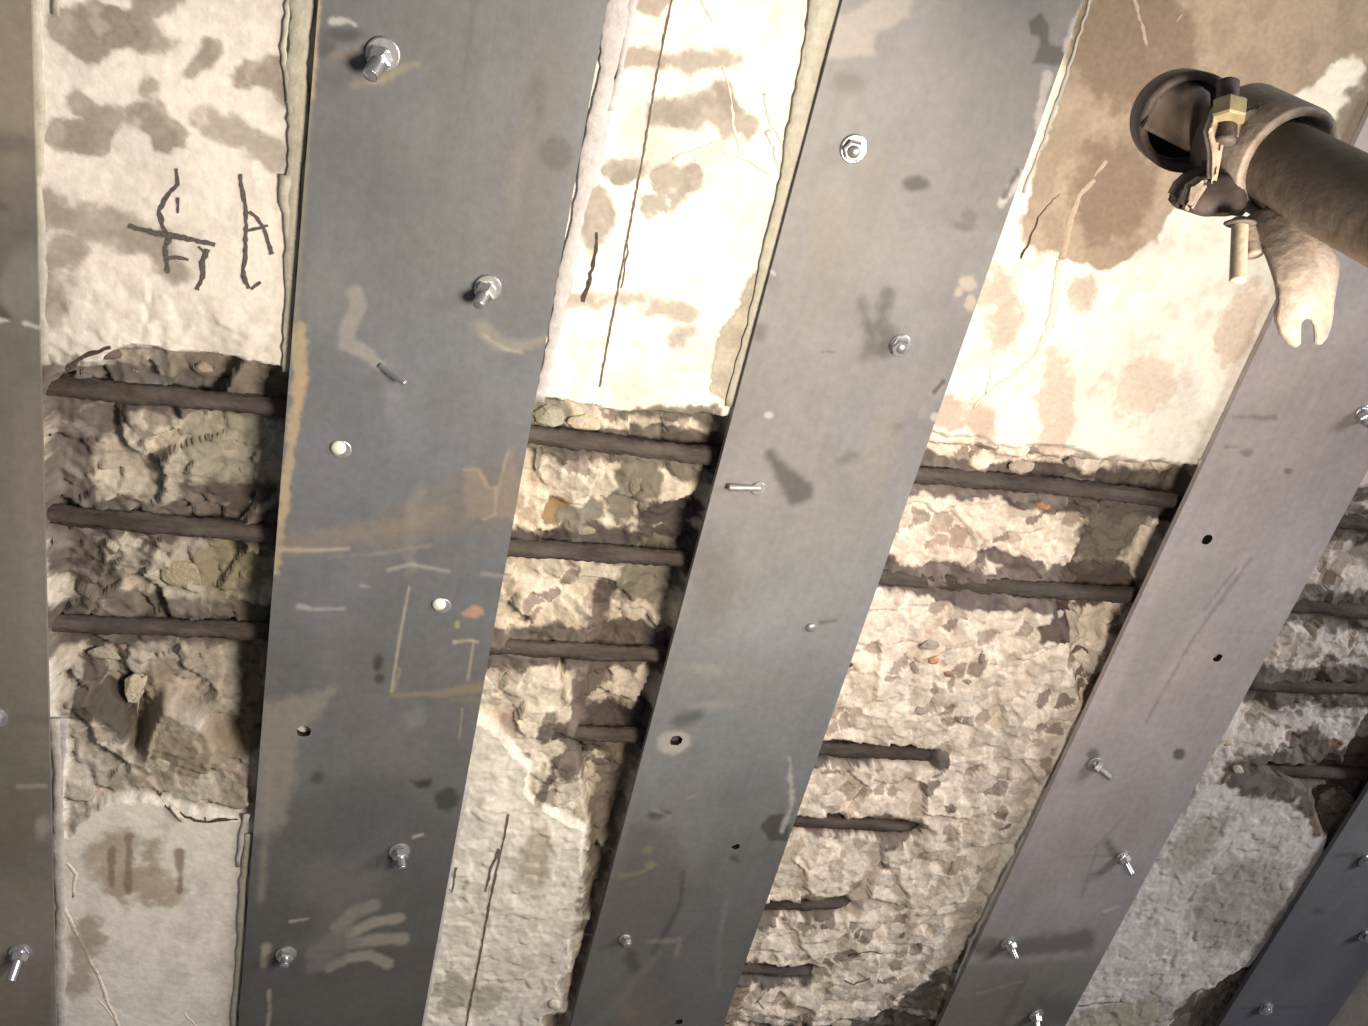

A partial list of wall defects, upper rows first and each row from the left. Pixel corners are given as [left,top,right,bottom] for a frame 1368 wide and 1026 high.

water stain [48,0,184,63]
water stain [44,80,288,172]
crack [581,0,673,387]
water stain [620,271,758,427]
water stain [624,48,758,139]
crack [1020,194,1060,259]
water stain [1022,0,1368,309]
spalling [43,342,287,840]
spalling [476,395,731,1026]
spalling [730,429,1198,1026]
spalling [1175,480,1368,862]
crack [451,814,510,1026]